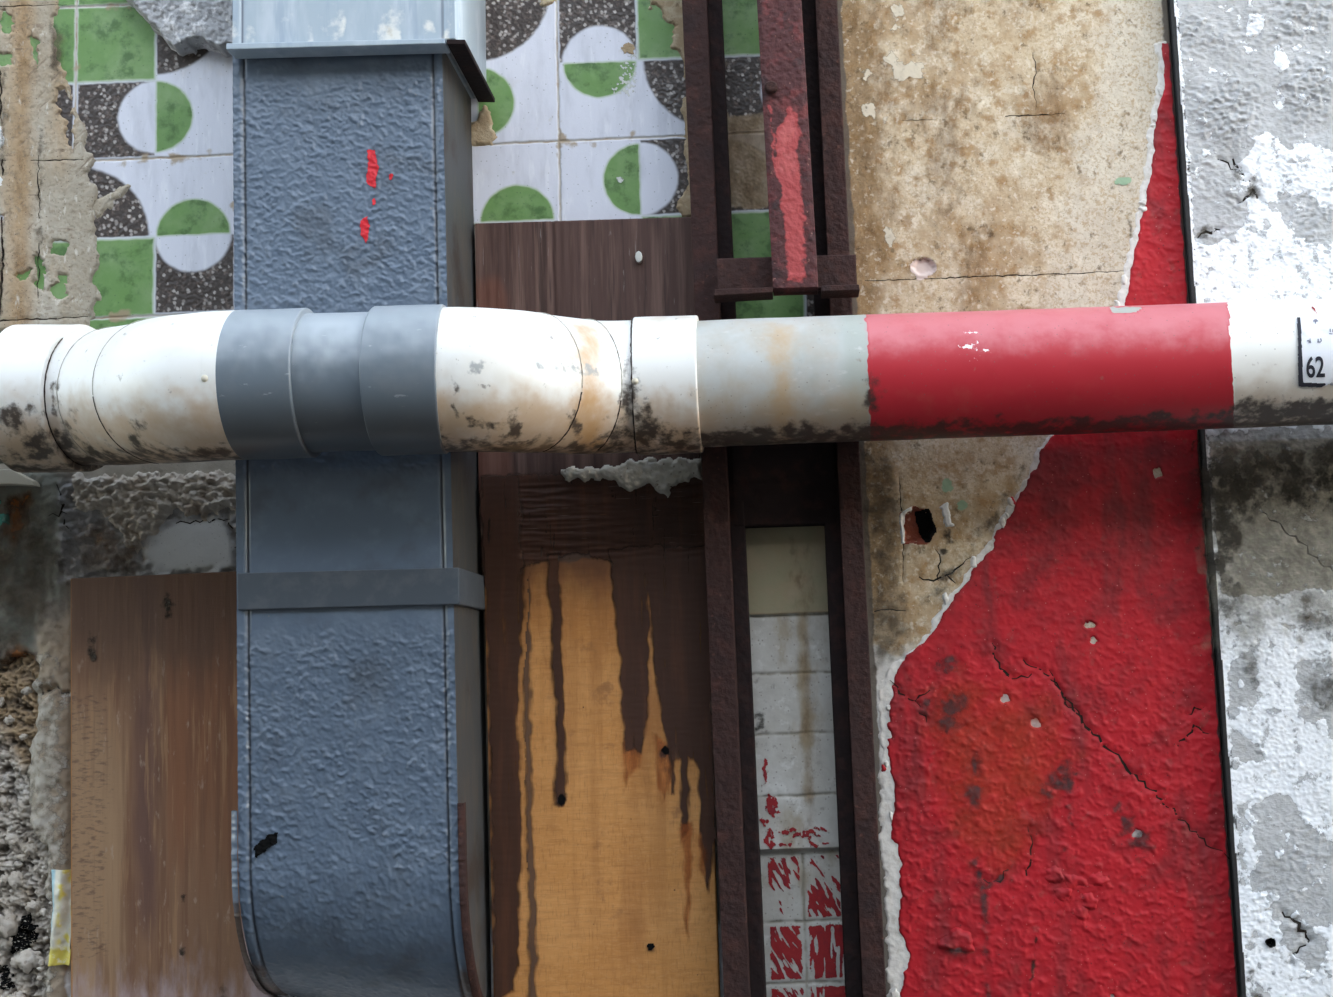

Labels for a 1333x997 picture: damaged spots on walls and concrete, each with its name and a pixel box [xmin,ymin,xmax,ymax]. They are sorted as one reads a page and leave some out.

peeling [1114,0,1333,306]
leakage [1197,440,1333,643]
spalling [0,653,71,997]
leakage [479,472,716,997]
peeling [760,759,845,997]
peeling [876,425,1333,997]
crack [992,643,1230,859]
crack [1282,912,1310,955]
leakage [1309,657,1333,709]